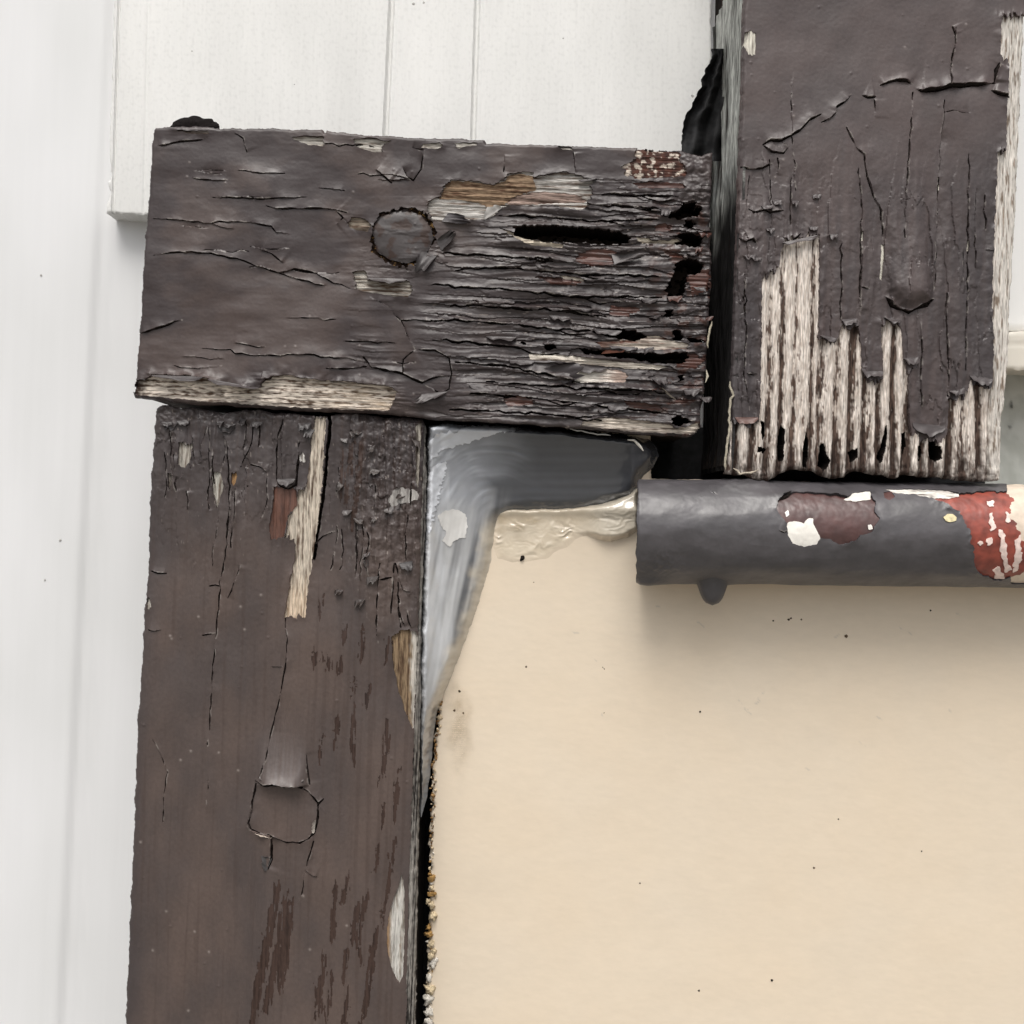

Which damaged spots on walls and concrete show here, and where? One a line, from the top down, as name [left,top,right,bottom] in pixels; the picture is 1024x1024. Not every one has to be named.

crack [166,134,423,289]
crack [176,208,706,422]
peeling [427,172,596,224]
peeling [509,329,706,435]
peeling [621,149,687,189]
peeling [723,14,1024,579]
crack [740,28,1010,403]
crack [165,419,300,745]
peeling [135,375,397,618]
crack [331,475,412,628]
crack [248,617,324,894]
peeling [387,875,405,982]